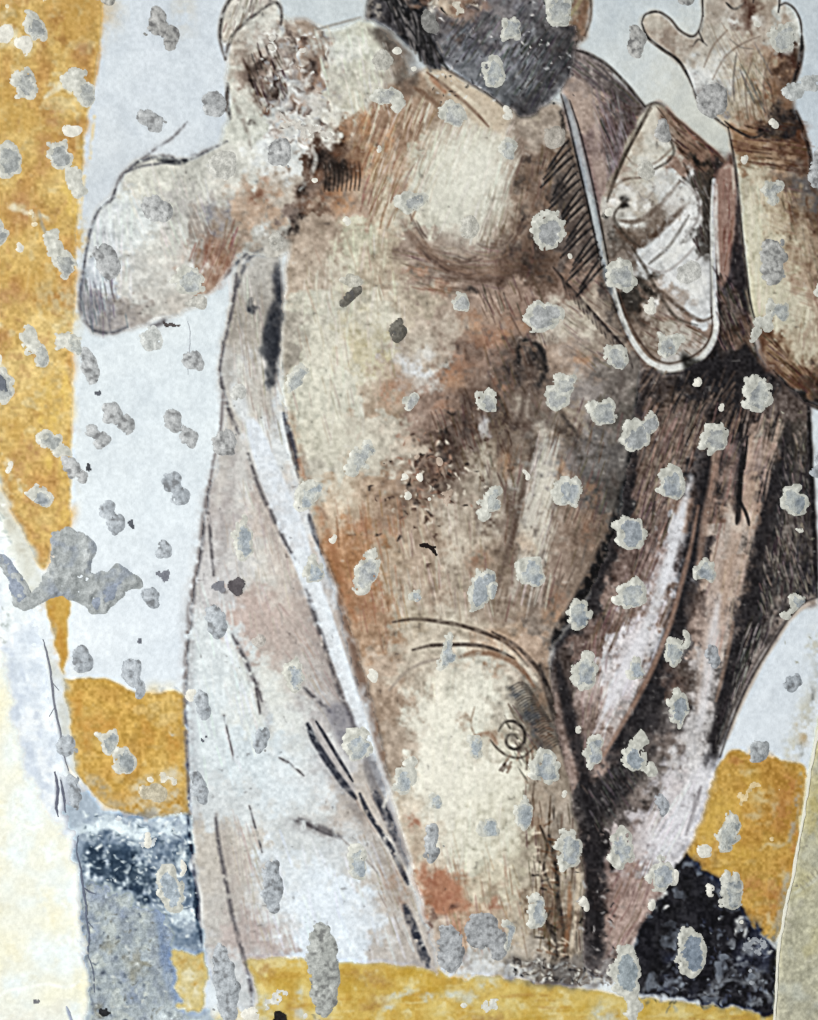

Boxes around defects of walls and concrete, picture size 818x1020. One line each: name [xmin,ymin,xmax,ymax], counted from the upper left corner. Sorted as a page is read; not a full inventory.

peeling [279,112,332,142]
peeling [737,782,761,806]